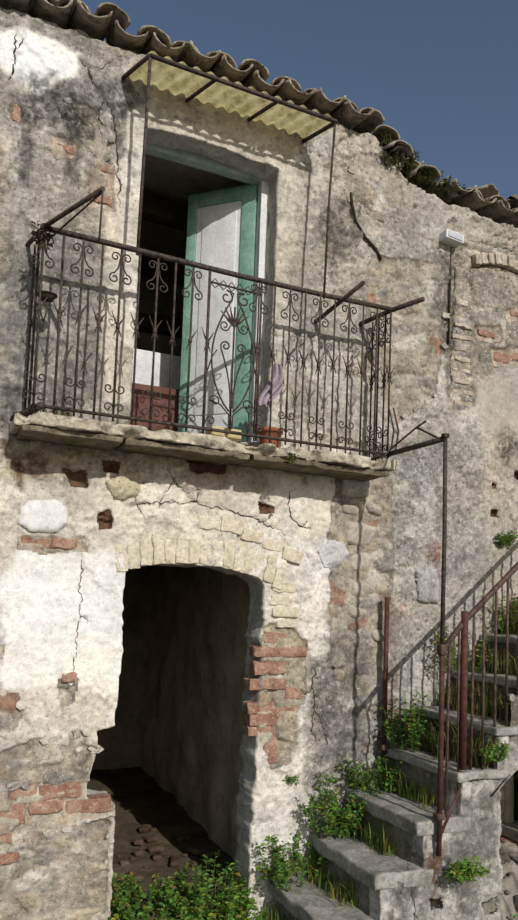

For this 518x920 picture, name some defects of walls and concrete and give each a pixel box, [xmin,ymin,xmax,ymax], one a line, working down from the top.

crack [9,33,26,79]
crack [54,59,122,208]
flaking render [474,306,518,368]
crack [135,467,311,535]
crack [73,552,86,671]
peeling [0,689,31,738]
flaking render [242,623,308,770]
peeling [0,727,114,920]